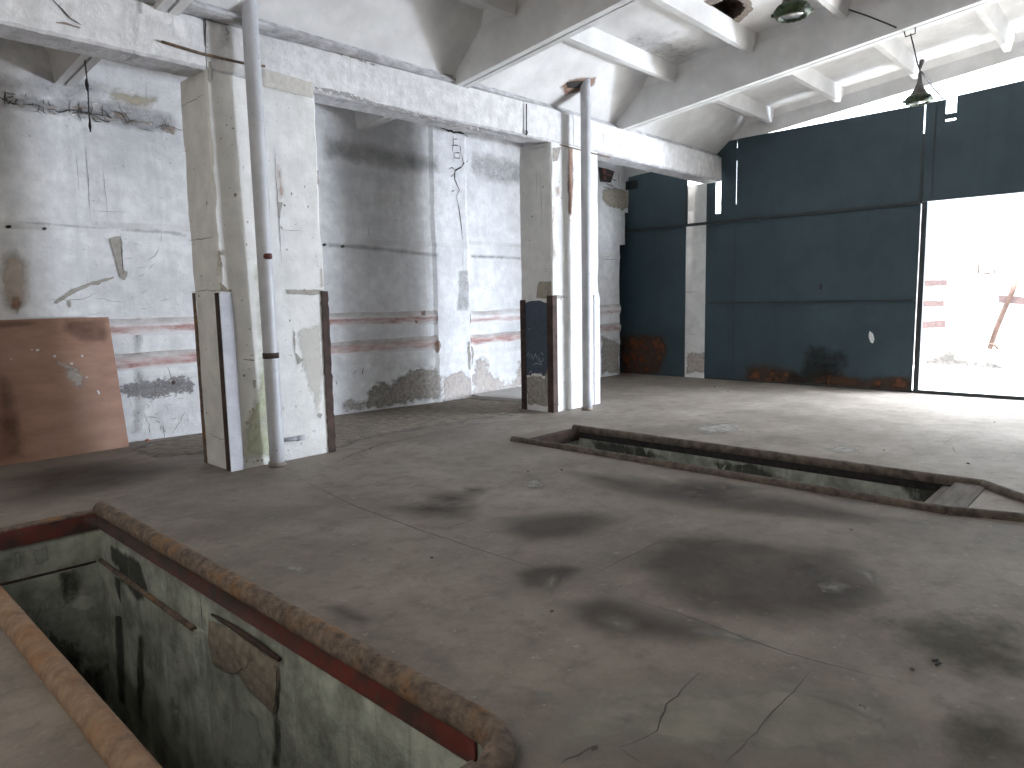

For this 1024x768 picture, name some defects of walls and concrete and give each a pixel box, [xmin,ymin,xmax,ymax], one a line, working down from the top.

spalling [704,0,753,23]
flaking render [0,92,183,134]
crack [442,128,468,274]
flaking render [598,167,629,210]
flaking render [109,236,127,280]
peeling [289,319,322,419]
flaking render [344,341,548,412]
rust [621,335,666,373]
rust [747,366,909,390]
crack [562,672,700,765]